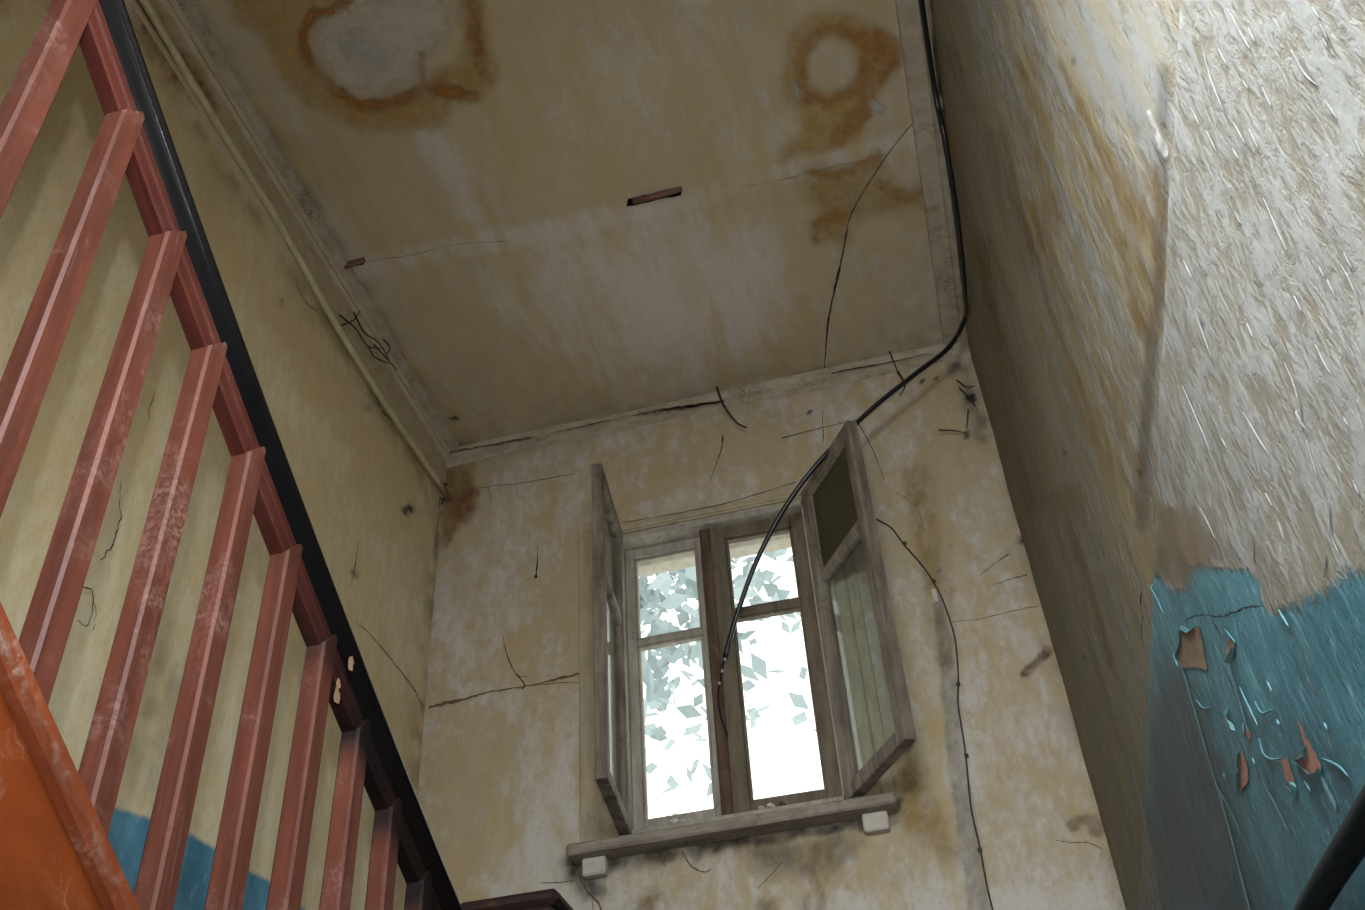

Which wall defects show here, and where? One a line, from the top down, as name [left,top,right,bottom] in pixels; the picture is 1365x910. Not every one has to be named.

leakage [235,0,486,122]
crack [742,124,929,374]
crack [357,623,579,709]
crack [952,553,1038,622]
peeling [1173,626,1207,670]
crack [1185,605,1263,646]
peeling [1224,629,1235,663]
peeling [1196,687,1349,798]